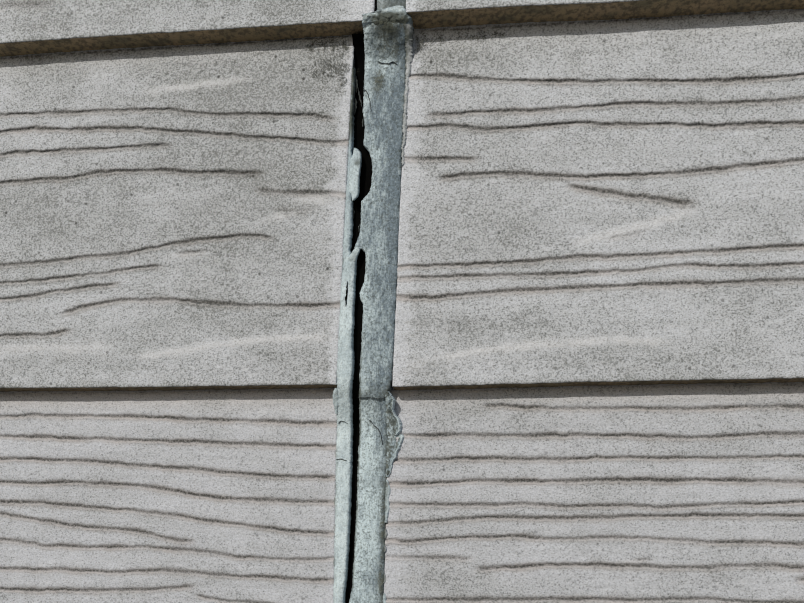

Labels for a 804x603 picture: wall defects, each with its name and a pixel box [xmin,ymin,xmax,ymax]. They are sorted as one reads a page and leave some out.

peeling [349,148,362,201]
peeling [347,247,361,265]
crack [338,33,394,603]
peeling [384,392,404,477]